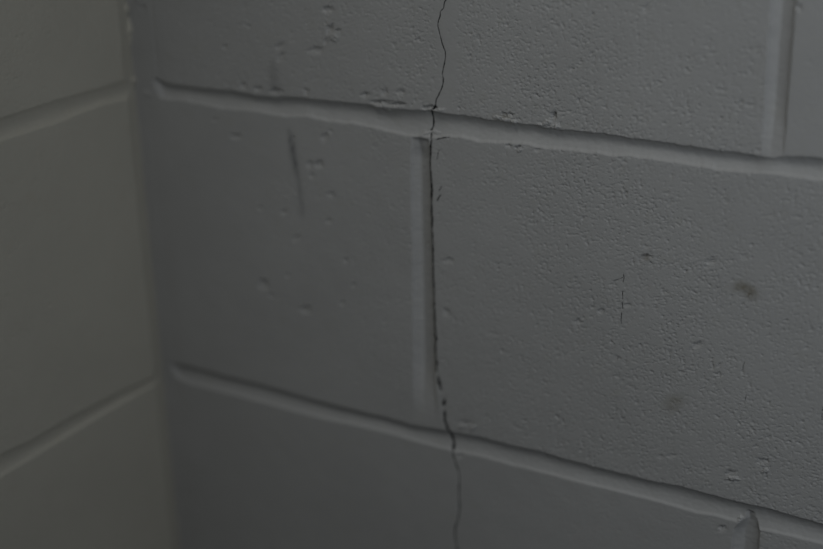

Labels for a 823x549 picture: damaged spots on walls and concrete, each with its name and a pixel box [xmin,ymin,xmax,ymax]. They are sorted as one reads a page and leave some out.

crack [430,0,460,549]